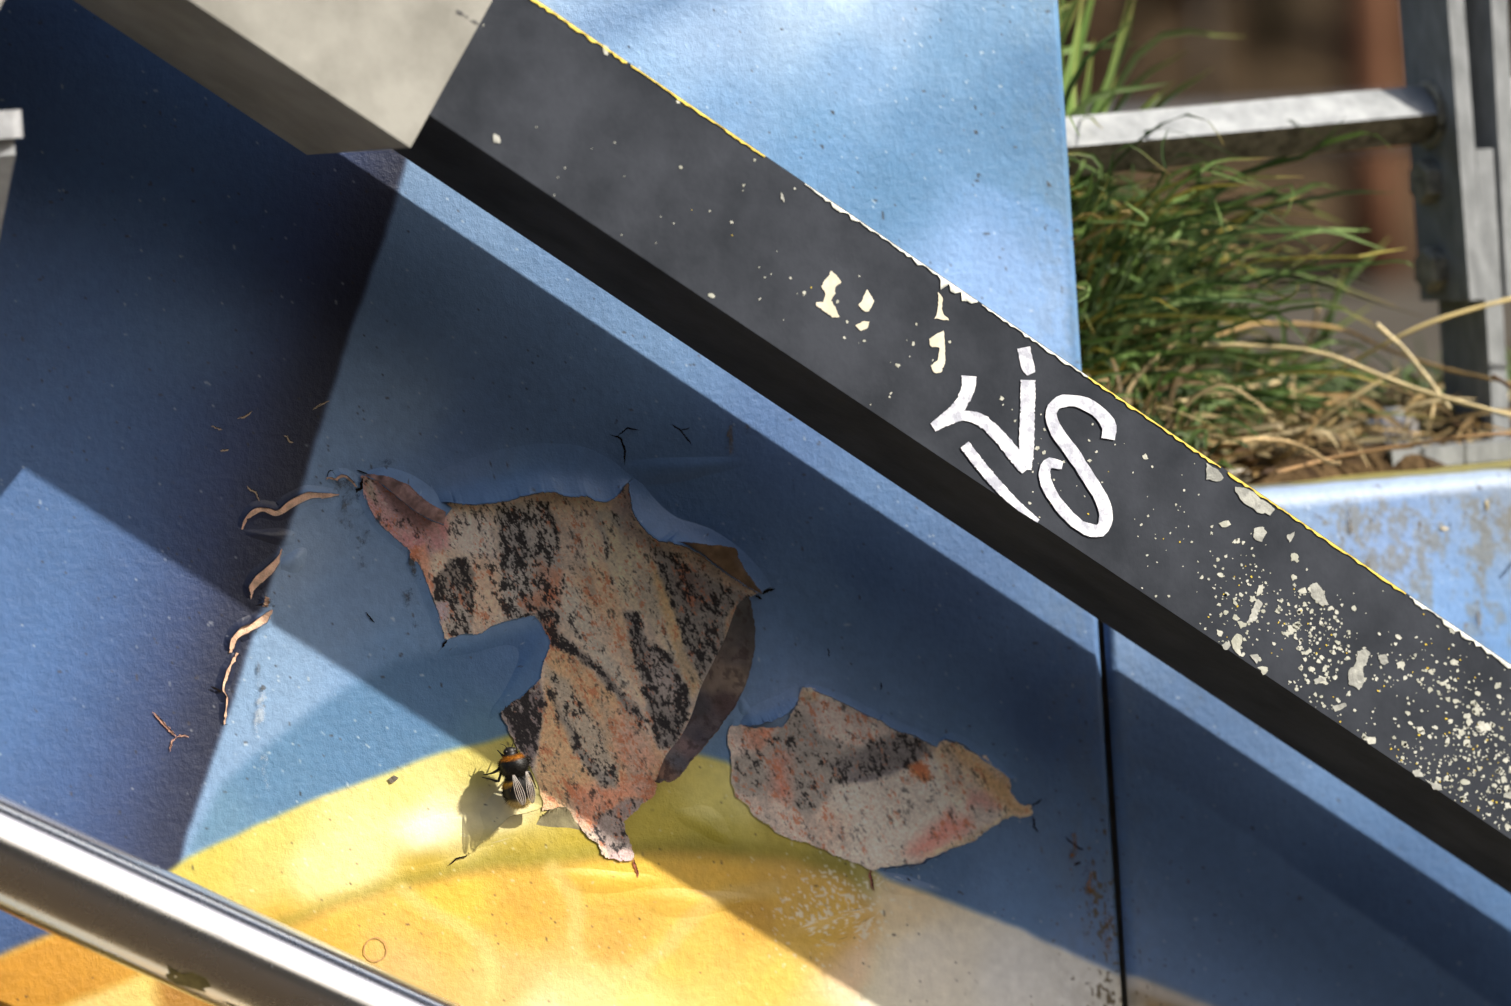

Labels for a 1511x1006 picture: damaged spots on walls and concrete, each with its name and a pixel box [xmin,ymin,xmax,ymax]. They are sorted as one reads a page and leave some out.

spalling [781,184,1088,377]
peeling [357,443,1033,875]
spalling [1134,463,1511,831]